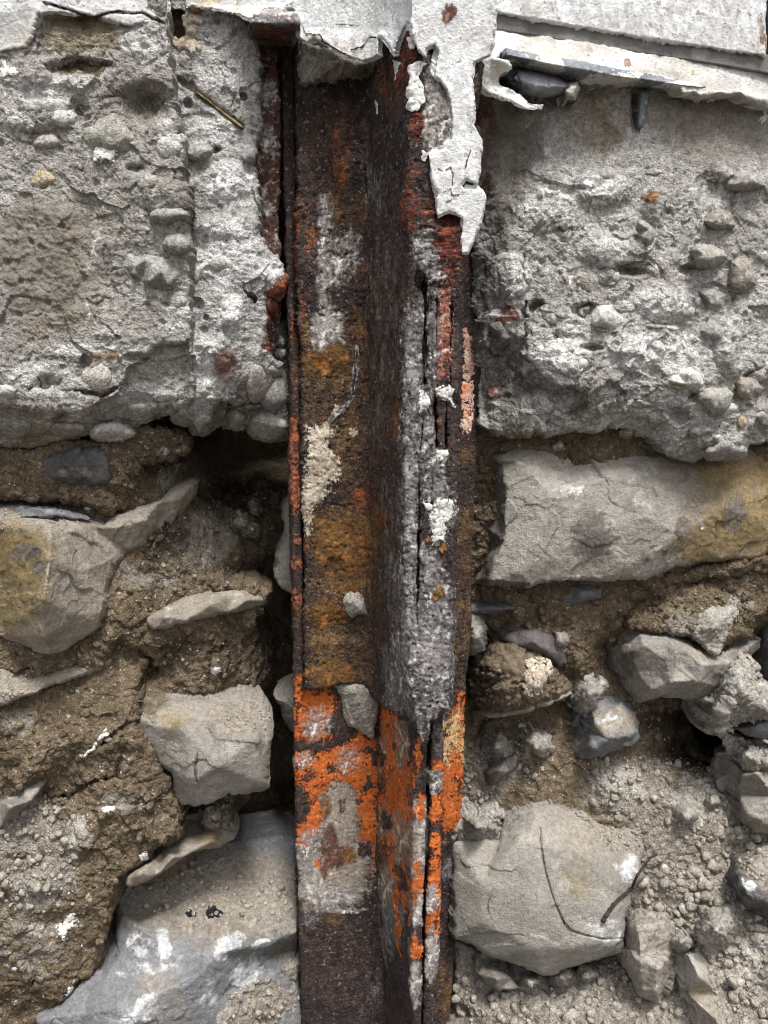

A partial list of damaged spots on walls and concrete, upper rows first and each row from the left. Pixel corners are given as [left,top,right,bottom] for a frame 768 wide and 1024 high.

rust [395,34,417,96]
rust [406,112,425,141]
peeling [392,52,452,161]
peeling [481,56,543,129]
rust [399,190,468,385]
rust [300,345,355,376]
crack [420,395,437,464]
leakage [300,404,358,537]
rust [304,506,380,629]
rust [304,657,357,690]
rust [407,721,418,766]
rust [293,703,396,880]